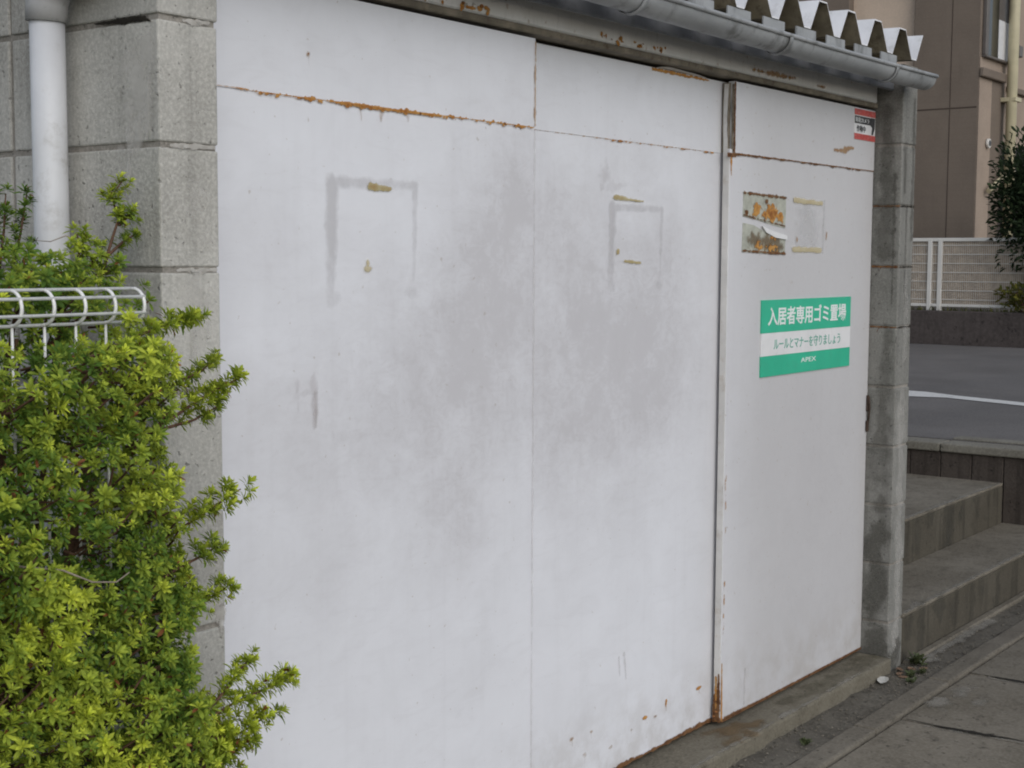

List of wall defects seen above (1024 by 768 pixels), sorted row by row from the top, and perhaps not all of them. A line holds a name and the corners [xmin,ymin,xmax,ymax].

corrosion [460,1,490,16]
corrosion [219,42,536,129]
corrosion [727,81,874,176]
corrosion [616,647,861,768]